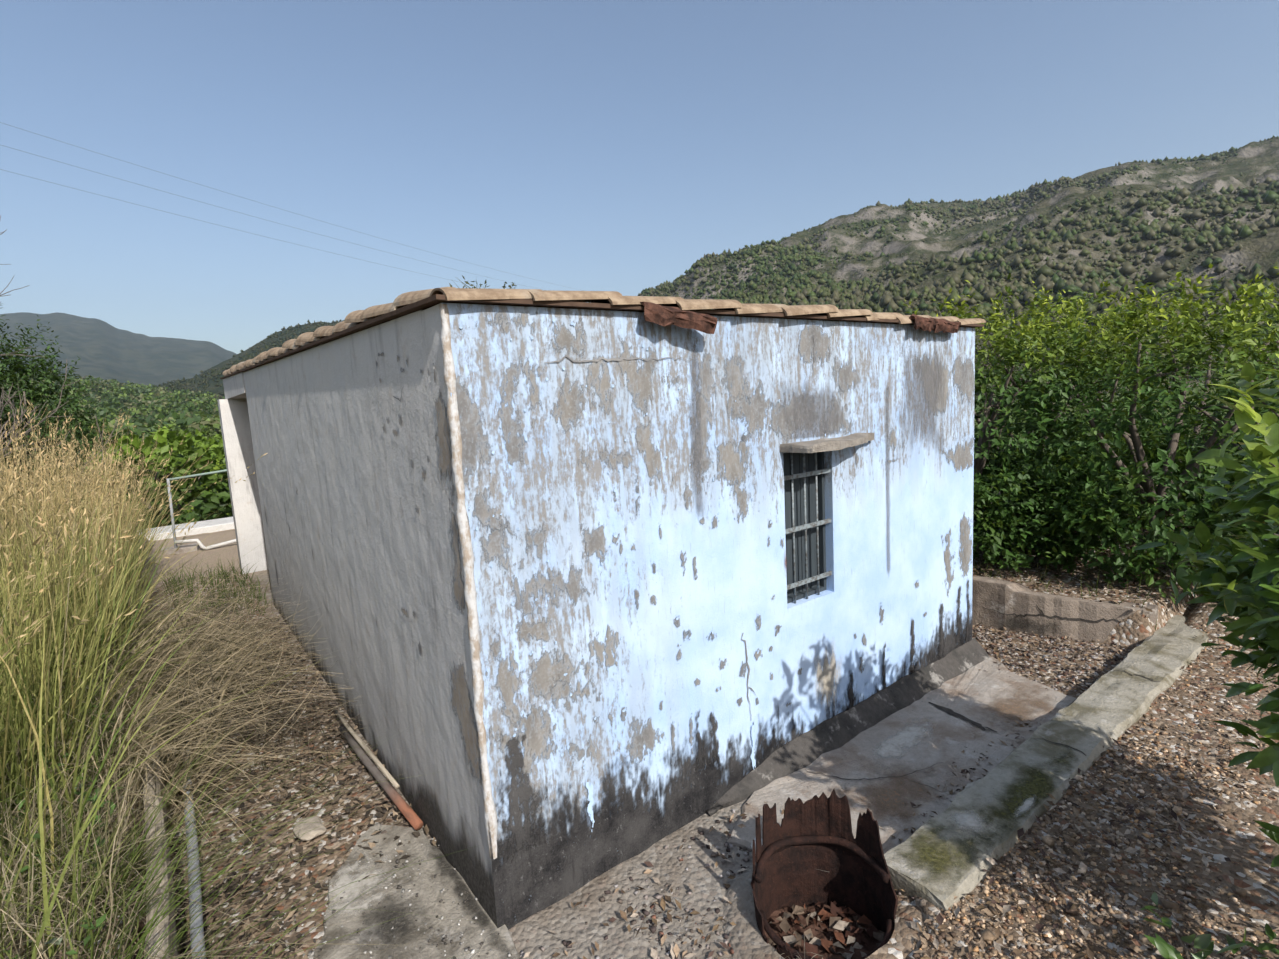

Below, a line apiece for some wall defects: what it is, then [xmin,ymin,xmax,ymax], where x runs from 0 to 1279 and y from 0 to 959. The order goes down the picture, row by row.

spalling [640,302,717,334]
spalling [909,314,961,333]
peeling [799,324,863,437]
peeling [917,354,975,417]
peeling [942,433,975,472]
peeling [376,312,813,793]
peeling [942,512,973,598]
crack [983,606,1121,623]
crack [928,702,997,732]
leakage [273,580,973,930]
leakage [956,814,980,827]